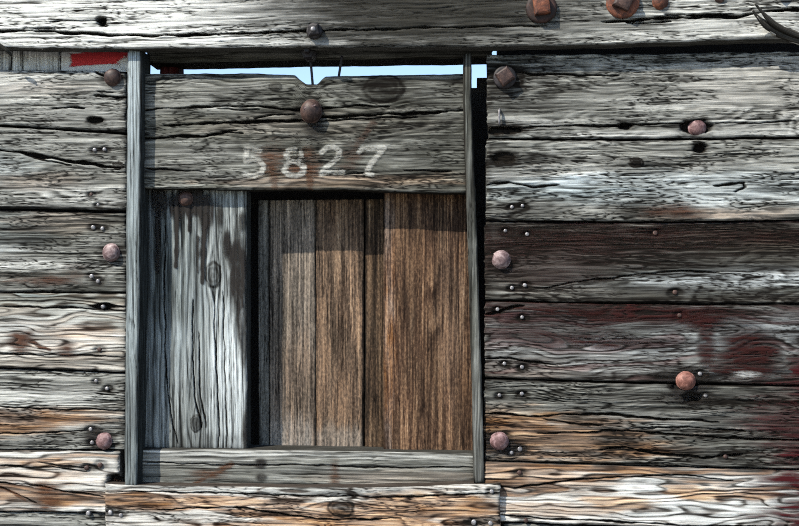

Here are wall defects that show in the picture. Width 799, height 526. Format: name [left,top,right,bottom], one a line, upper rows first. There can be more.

crack [603,8,799,24]
peeling [60,52,128,72]
crack [0,150,114,168]
leakage [151,190,214,284]